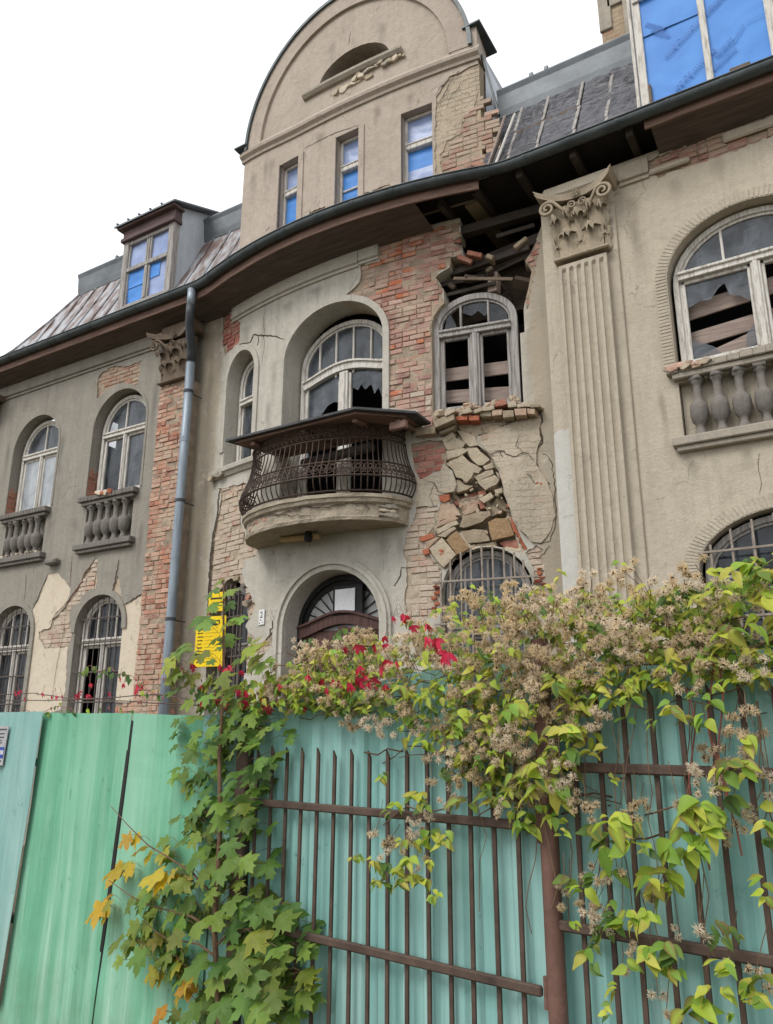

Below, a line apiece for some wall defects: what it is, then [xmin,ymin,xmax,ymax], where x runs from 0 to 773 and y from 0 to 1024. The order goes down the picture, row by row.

flaking render [434,64,501,174]
flaking render [25,558,98,714]
flaking render [97,360,142,398]
flaking render [113,576,142,713]
crack [207,490,220,611]
flaking render [222,313,240,356]
flaking render [207,471,272,673]
crack [241,306,284,359]
flaking render [343,223,546,630]
crack [480,413,557,558]